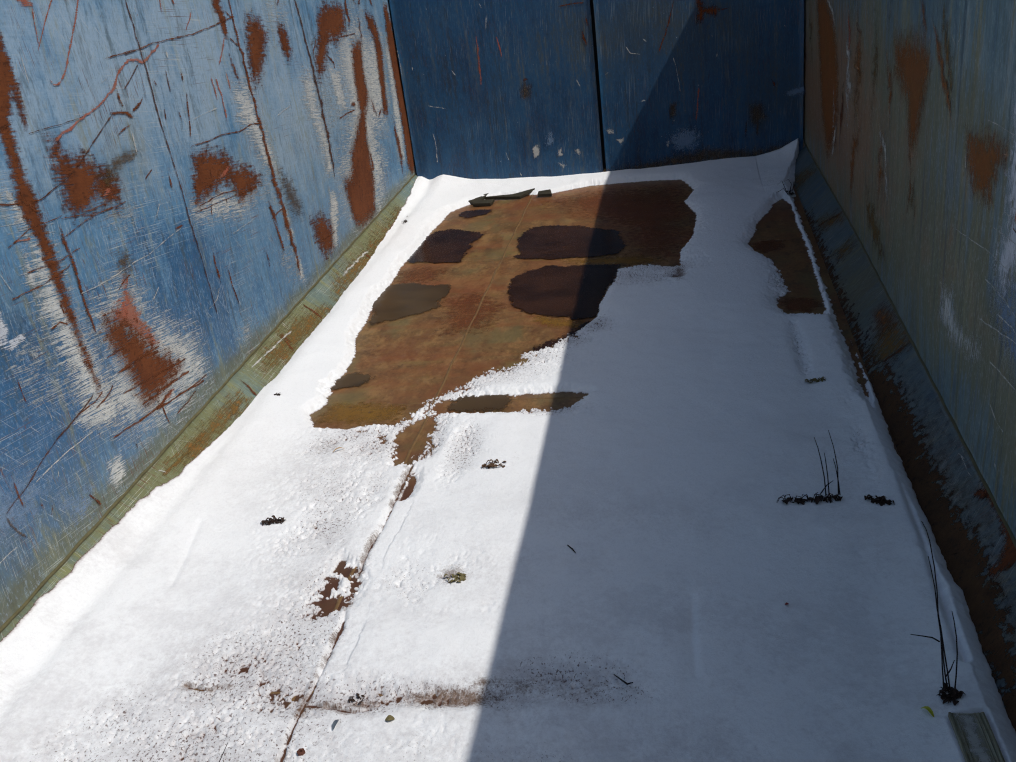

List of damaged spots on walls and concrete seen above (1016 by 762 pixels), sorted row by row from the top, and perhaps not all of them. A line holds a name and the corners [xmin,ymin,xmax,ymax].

rust [0,32,207,437]
rust [190,0,334,271]
rust [251,0,415,371]
rust [318,402,405,426]
rust [784,298,820,312]